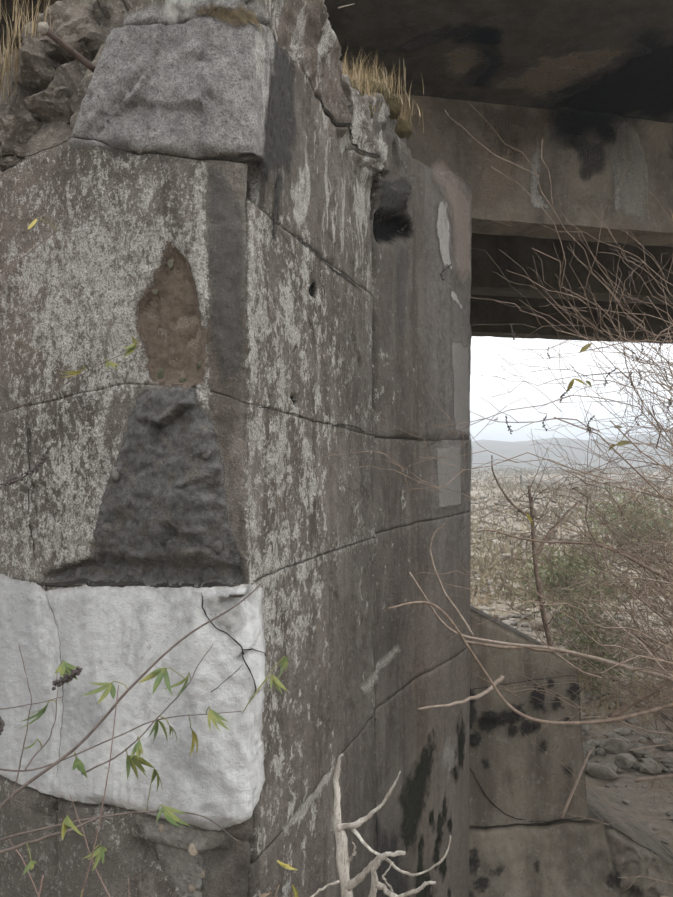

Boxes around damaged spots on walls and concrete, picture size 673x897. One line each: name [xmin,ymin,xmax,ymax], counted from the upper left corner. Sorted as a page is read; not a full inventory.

leakage [472,105,548,208]
leakage [537,30,673,218]
crack [298,235,359,295]
crack [255,405,443,442]
peeling [0,241,266,897]
crack [263,537,371,577]
leakage [443,679,583,772]
crack [470,768,576,823]
leakage [376,820,431,897]